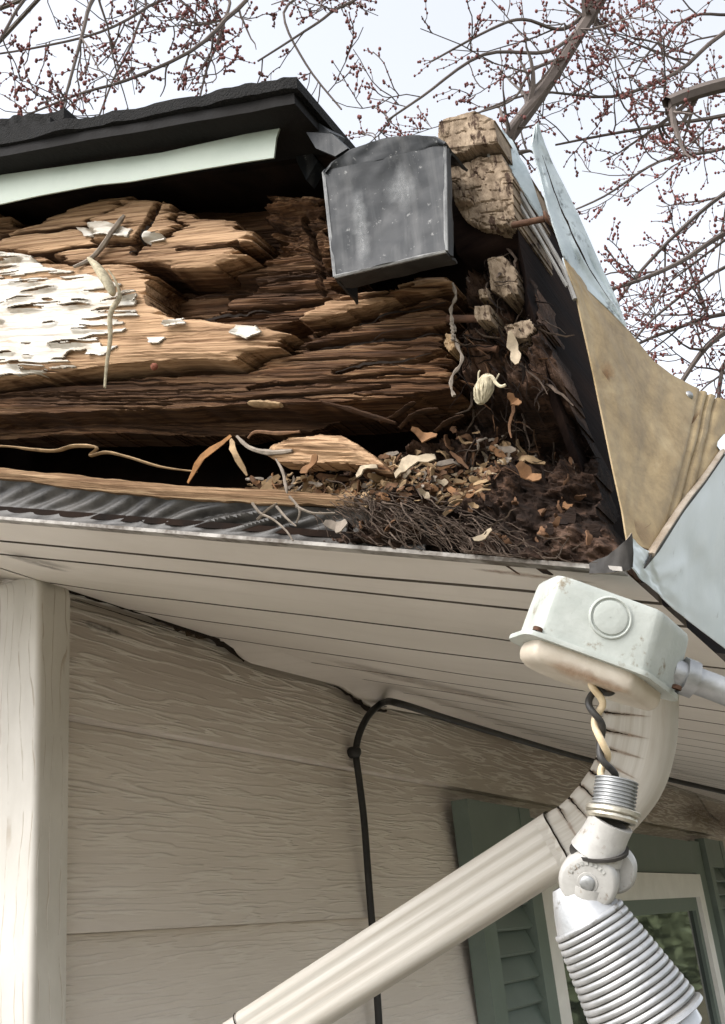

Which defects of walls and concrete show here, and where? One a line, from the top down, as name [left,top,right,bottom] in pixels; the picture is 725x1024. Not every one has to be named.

peeling [76,221,166,246]
crack [129,210,158,253]
peeling [0,251,140,378]
peeling [147,318,186,344]
peeling [229,325,262,339]
crack [318,302,446,373]
crack [69,590,245,662]
crack [333,686,387,712]